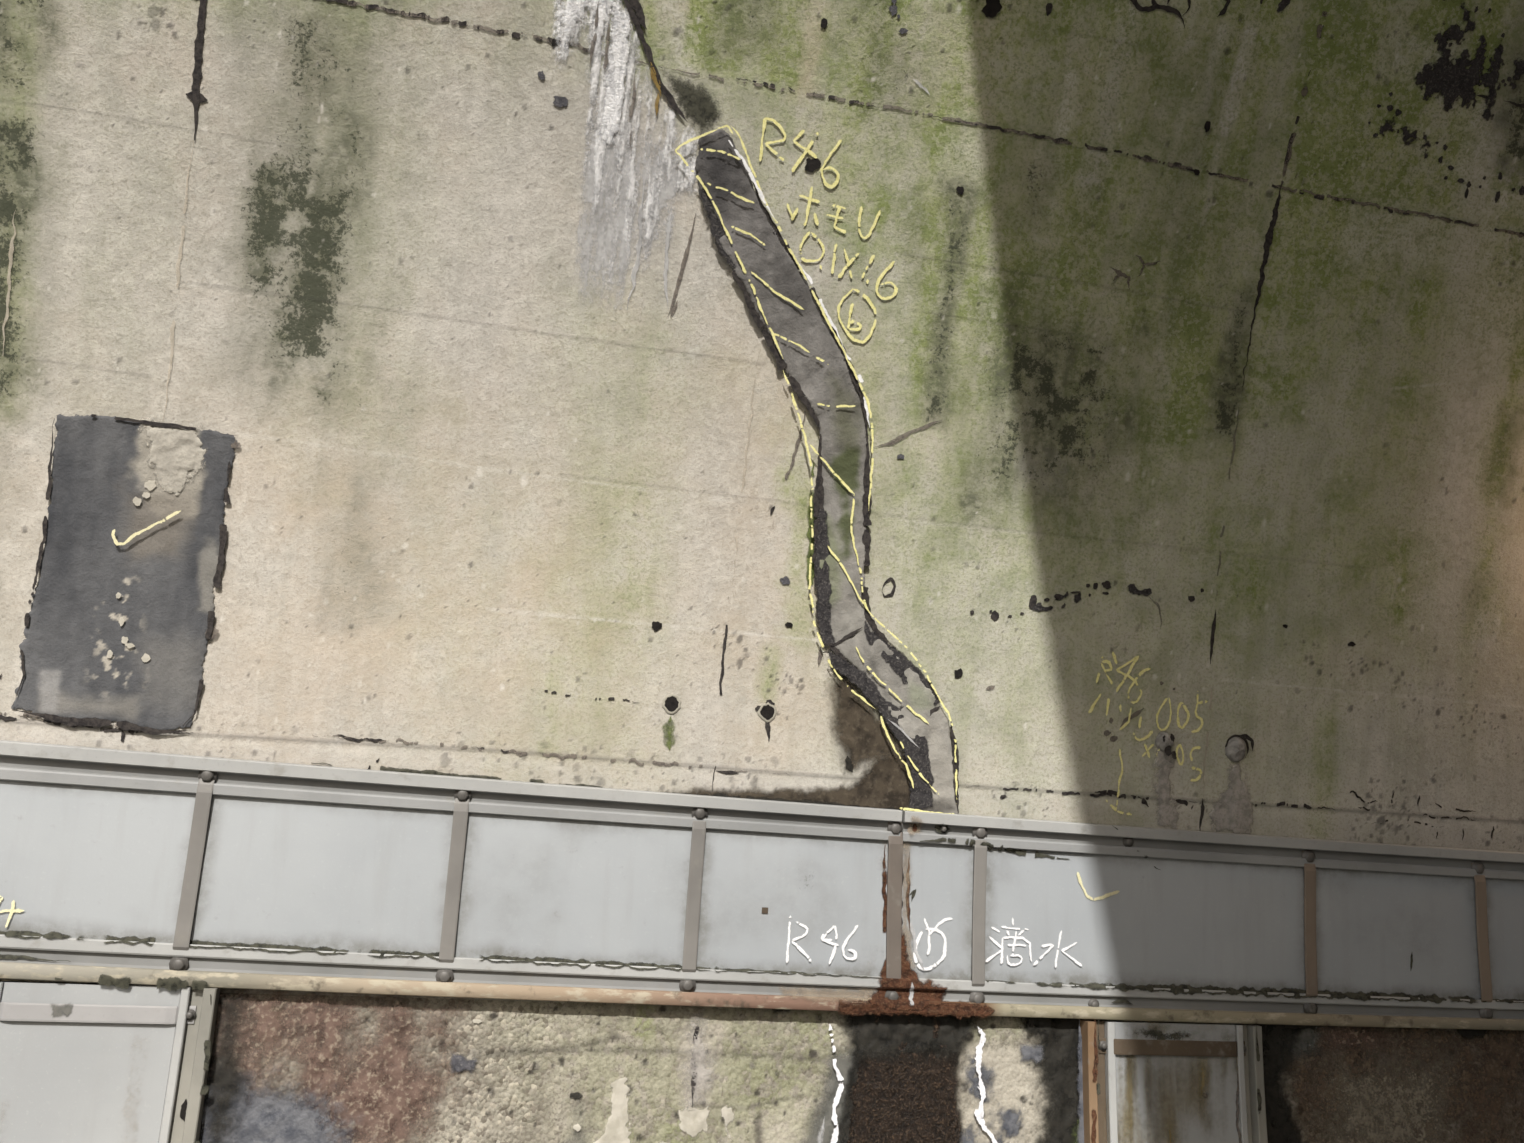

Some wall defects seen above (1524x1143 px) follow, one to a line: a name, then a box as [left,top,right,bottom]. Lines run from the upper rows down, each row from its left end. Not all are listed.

crack [2,210,16,350]
crack [0,418,204,742]
crack [91,0,241,640]
crack [313,734,787,791]
water stain [553,0,720,318]
crack [707,181,942,695]
crack [326,0,1524,479]
crack [930,526,1225,830]
spalling [1414,0,1524,121]
rust [784,817,995,1019]
water stain [806,1013,1021,1143]
water stain [1021,1017,1096,1143]